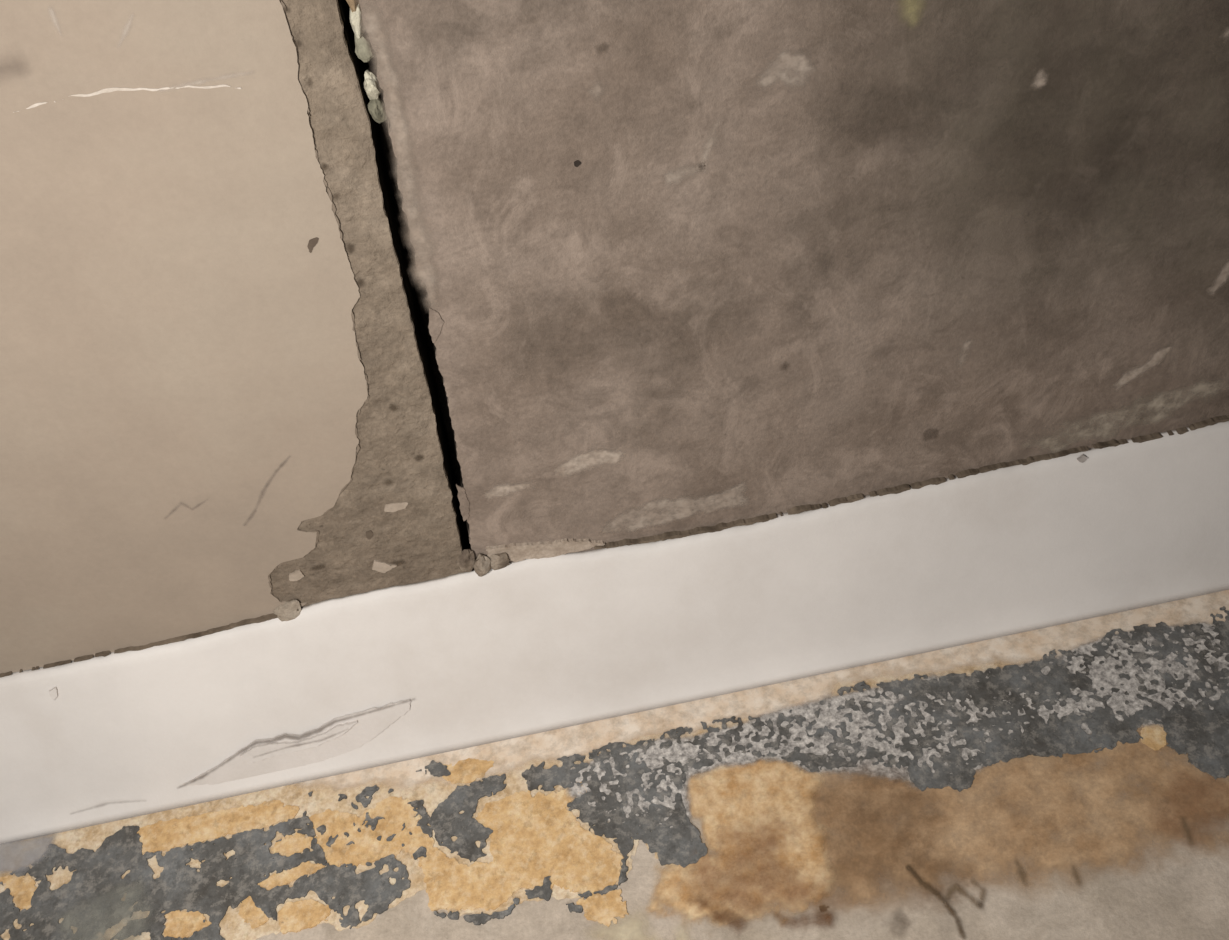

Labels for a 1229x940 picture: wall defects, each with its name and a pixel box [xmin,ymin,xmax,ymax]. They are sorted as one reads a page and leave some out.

flaking render [268,0,464,603]
crack [339,0,476,570]
peeling [0,606,1229,940]